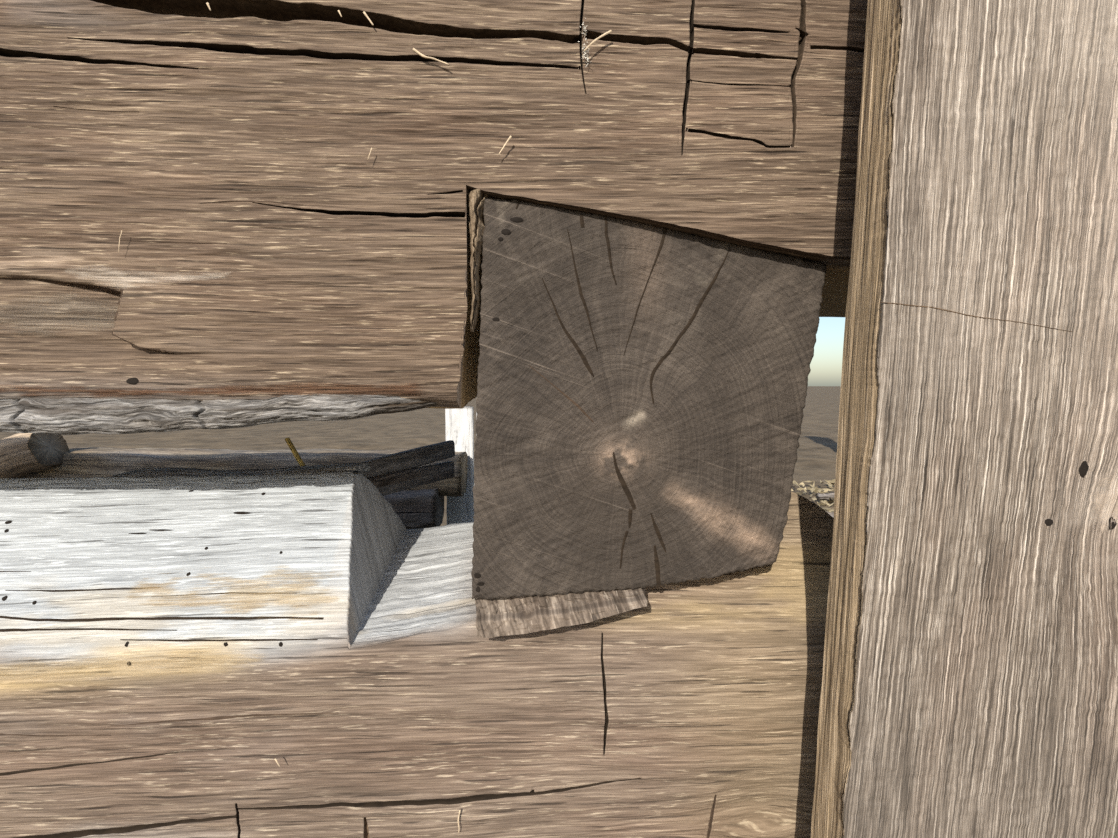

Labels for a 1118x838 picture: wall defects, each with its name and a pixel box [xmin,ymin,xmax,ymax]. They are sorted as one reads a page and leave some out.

crack [0,0,865,157]
crack [118,238,227,246]
crack [199,187,465,222]
crack [542,215,667,377]
crack [650,247,753,404]
crack [612,452,666,587]
crack [0,631,642,838]